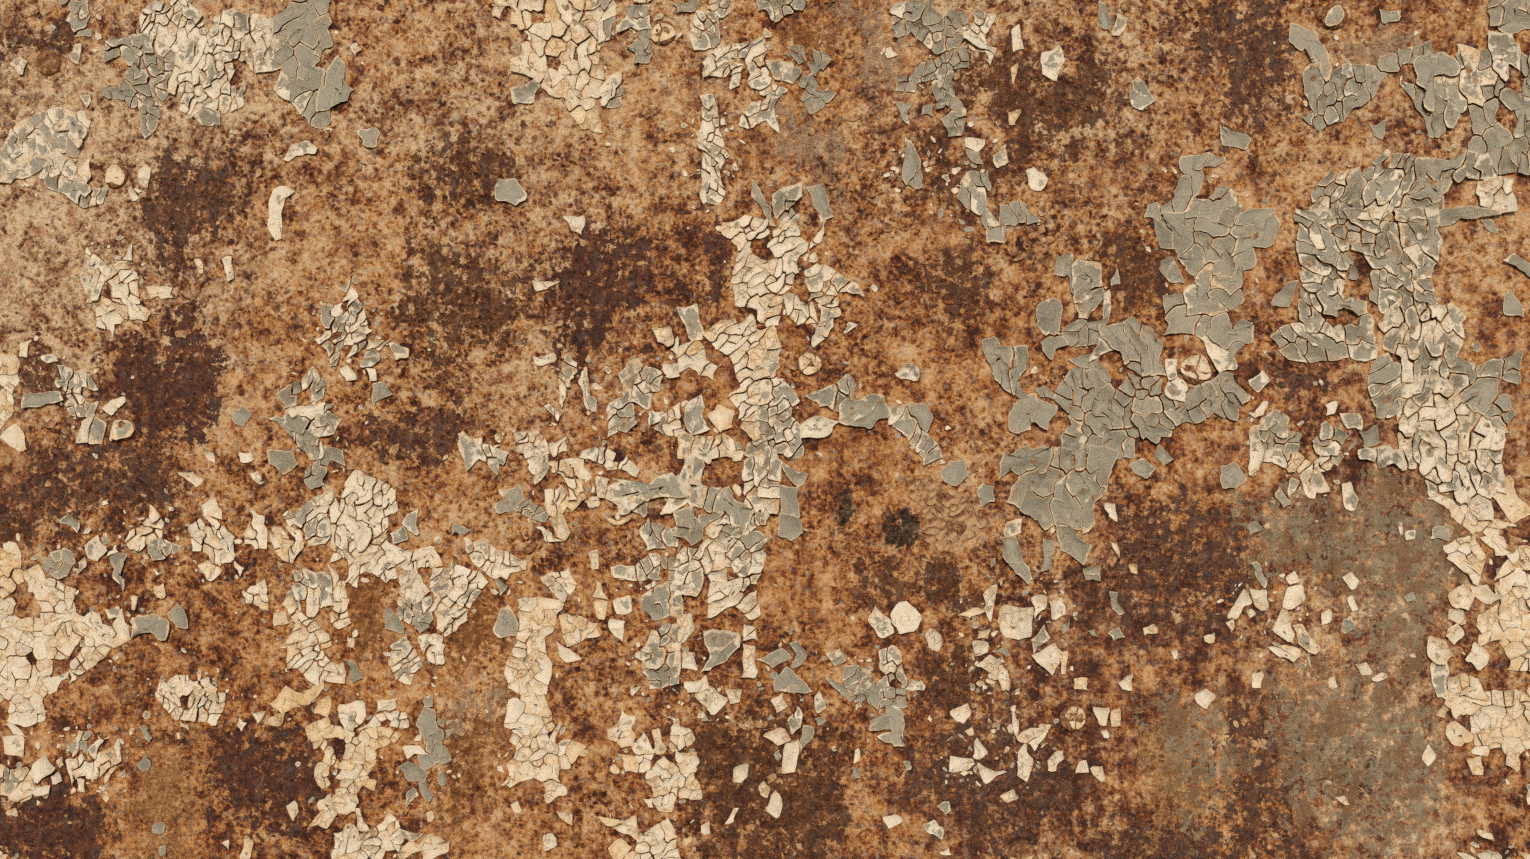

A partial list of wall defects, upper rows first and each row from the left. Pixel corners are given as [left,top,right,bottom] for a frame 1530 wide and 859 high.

peeling [0,0,361,208]
peeling [492,0,652,133]
peeling [671,0,837,205]
peeling [885,0,1049,243]
corrosion [913,8,1143,216]
corrosion [1160,0,1323,177]
corrosion [0,138,254,567]
peeling [0,178,969,859]
corrosion [358,120,741,478]
peeling [949,0,1530,859]
corrosion [0,702,333,859]
corrosion [653,474,1396,859]